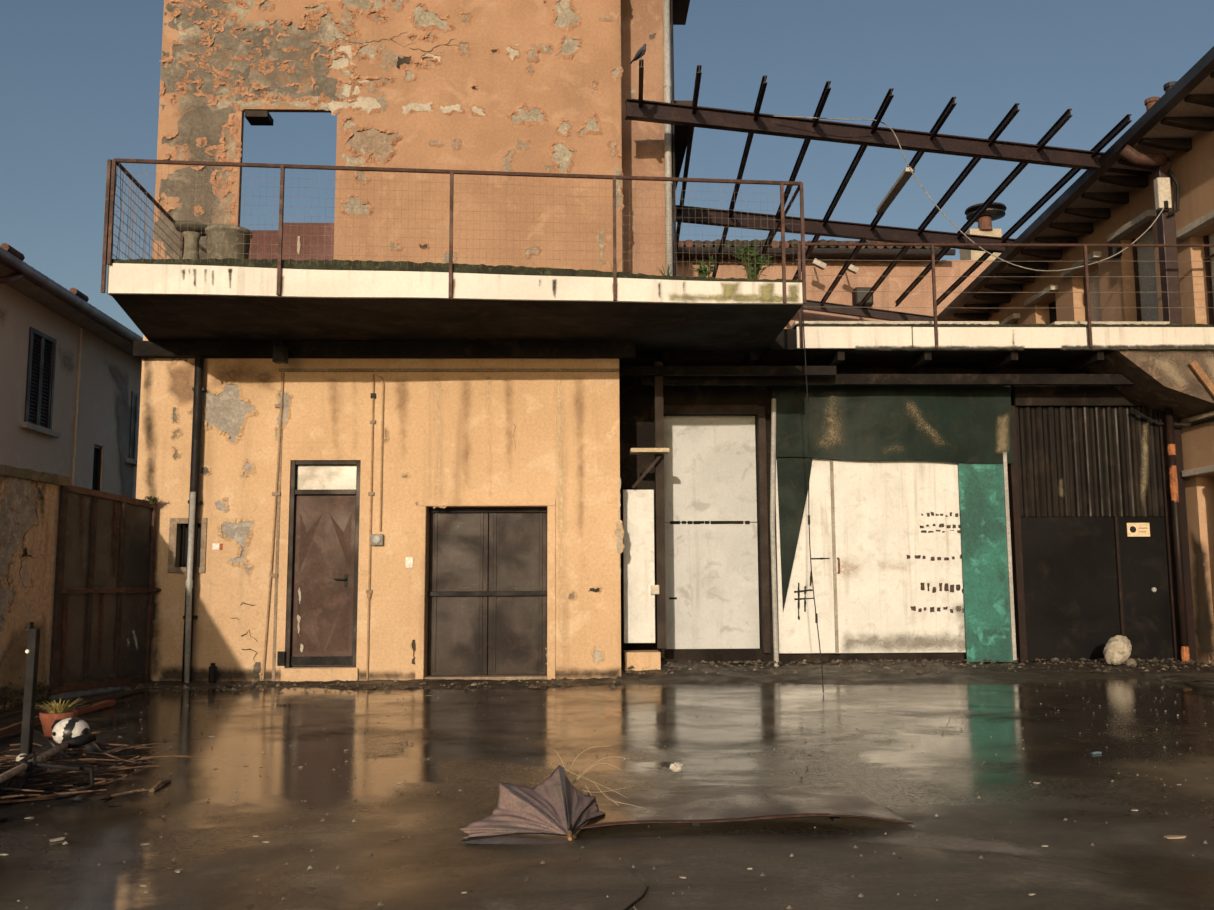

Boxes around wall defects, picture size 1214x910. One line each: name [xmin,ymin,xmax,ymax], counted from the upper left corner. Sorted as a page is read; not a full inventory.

flaking render [159,0,488,225]
peeling [489,0,583,76]
peeling [590,66,624,90]
peeling [501,102,624,212]
peeling [443,250,458,264]
water stain [658,283,797,302]
peeling [0,475,40,632]
peeling [215,497,256,577]